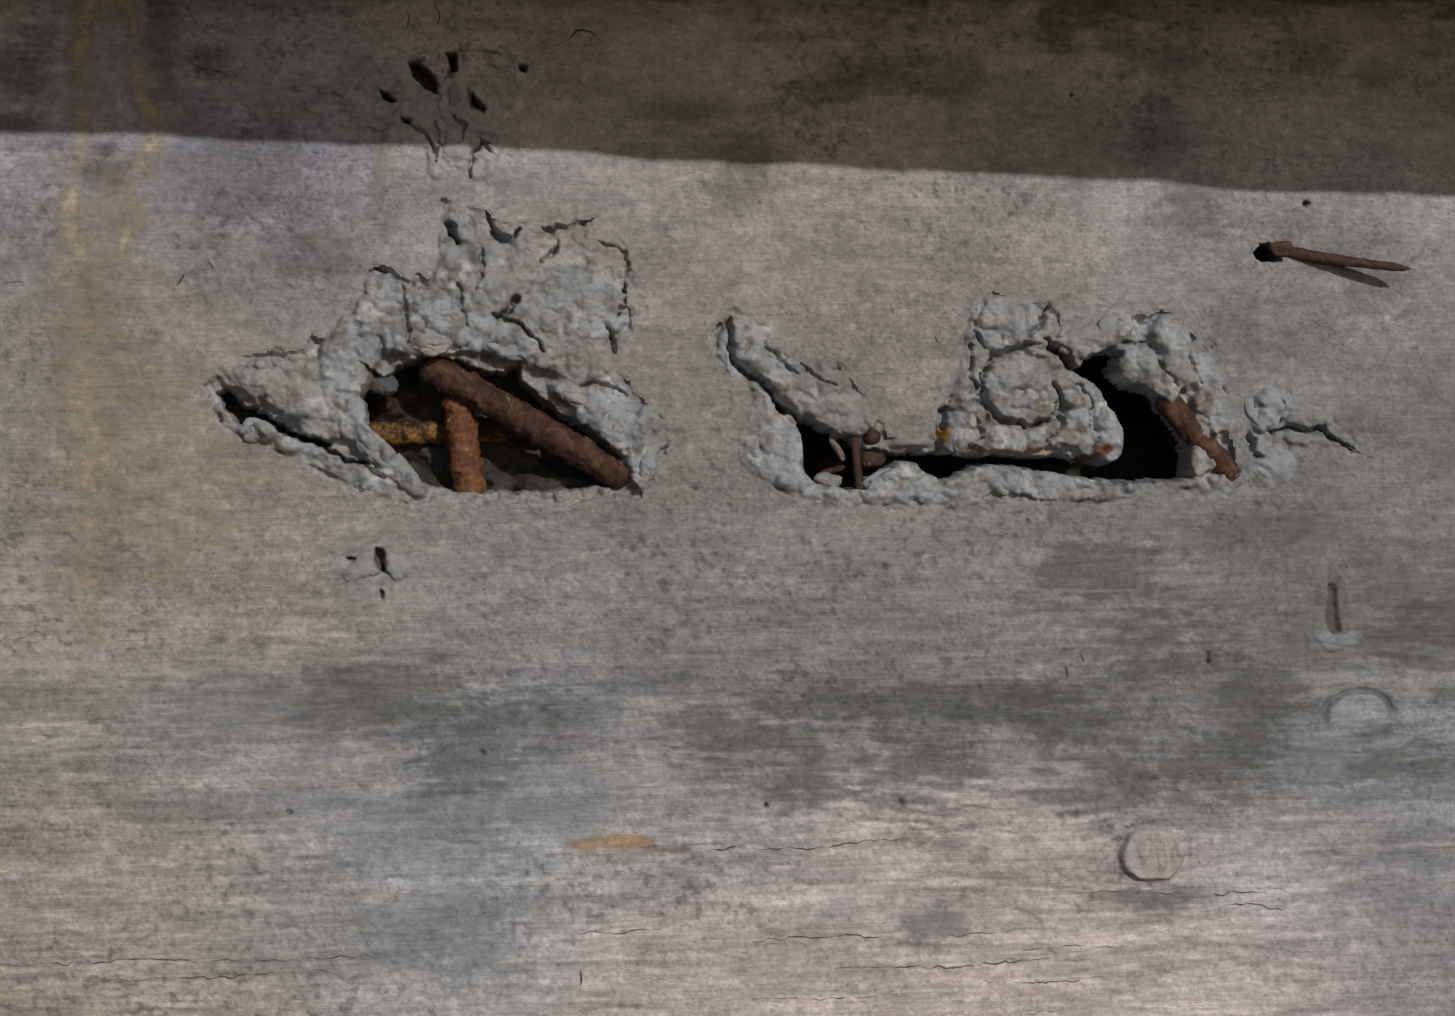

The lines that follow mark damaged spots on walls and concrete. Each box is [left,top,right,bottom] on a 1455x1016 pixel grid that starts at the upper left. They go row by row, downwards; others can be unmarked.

spalling [200,36,673,512]
corrosion [1268,241,1293,256]
spalling [707,286,1366,520]